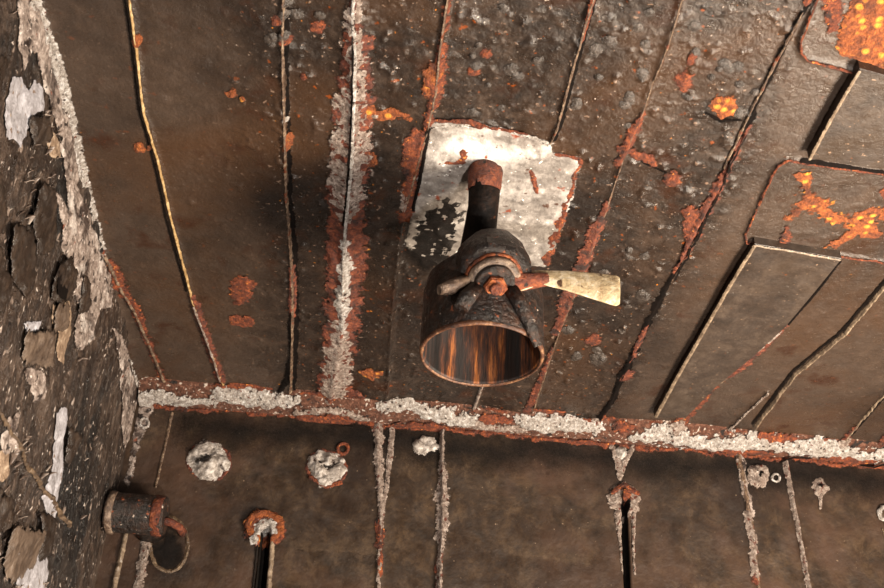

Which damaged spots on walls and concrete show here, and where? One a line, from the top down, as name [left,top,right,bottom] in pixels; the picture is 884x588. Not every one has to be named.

peeling [0,407,82,588]
peeling [0,0,114,402]
peeling [112,328,154,486]
corrosion [153,0,884,470]